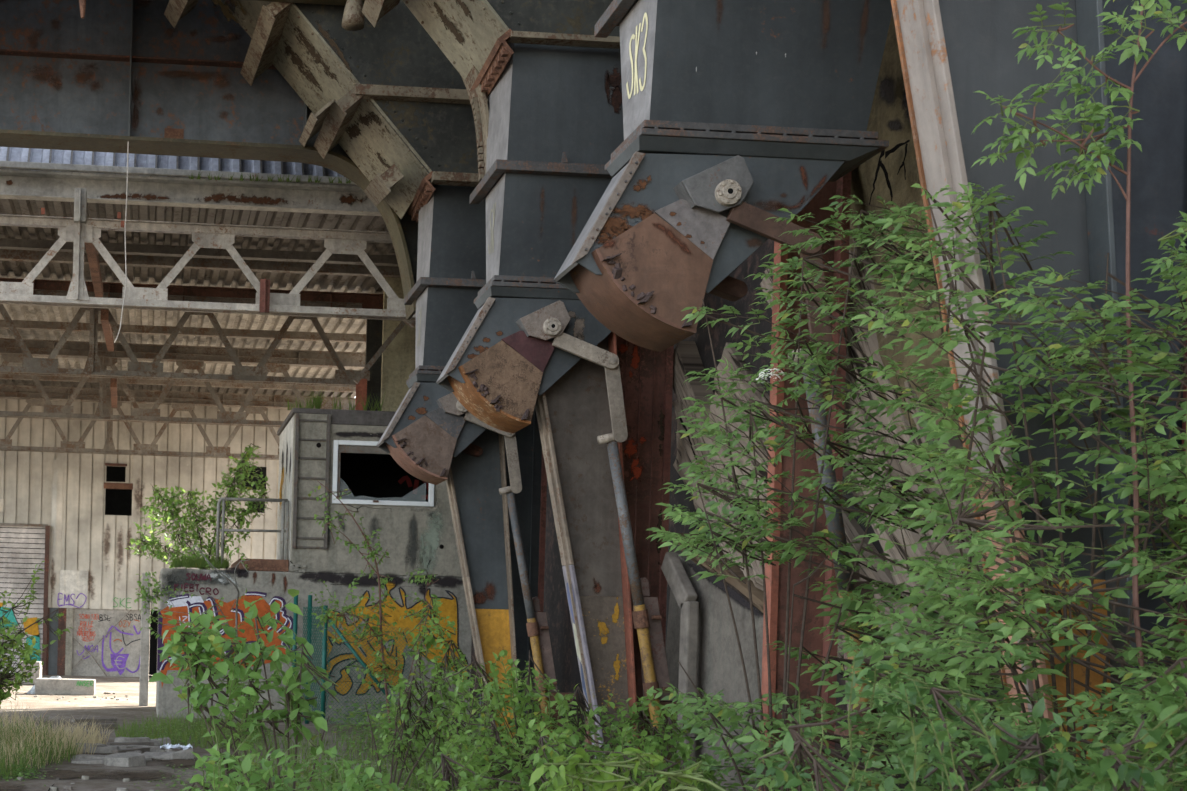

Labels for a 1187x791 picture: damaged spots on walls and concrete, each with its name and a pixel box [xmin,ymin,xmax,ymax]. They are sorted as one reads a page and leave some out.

peeling [433,2,465,46]
peeling [456,0,474,21]
peeling [283,22,352,94]
peeling [346,111,389,139]
crack [869,140,910,206]
corrosion [100,193,170,201]
corrosion [194,193,294,205]
corrosion [339,194,367,205]
corrosion [596,175,705,254]